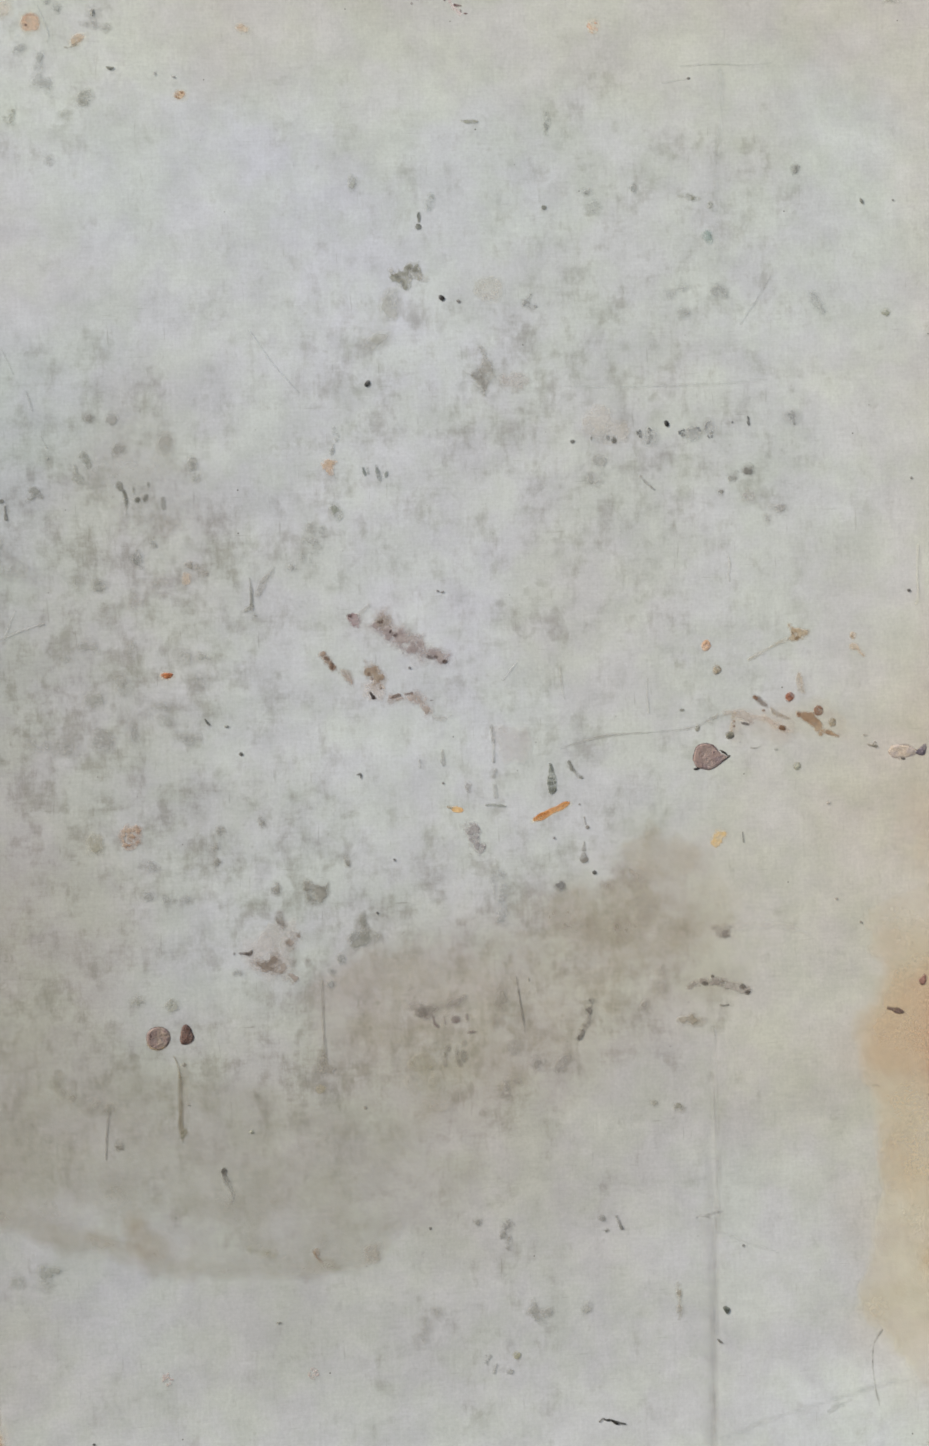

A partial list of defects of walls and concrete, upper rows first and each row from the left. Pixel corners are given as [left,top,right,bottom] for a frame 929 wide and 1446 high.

leakage [466,824,485,853]
leakage [304,882,327,902]
leakage [243,919,300,981]
leakage [328,917,378,987]
leakage [688,975,750,1006]
leakage [410,997,474,1033]